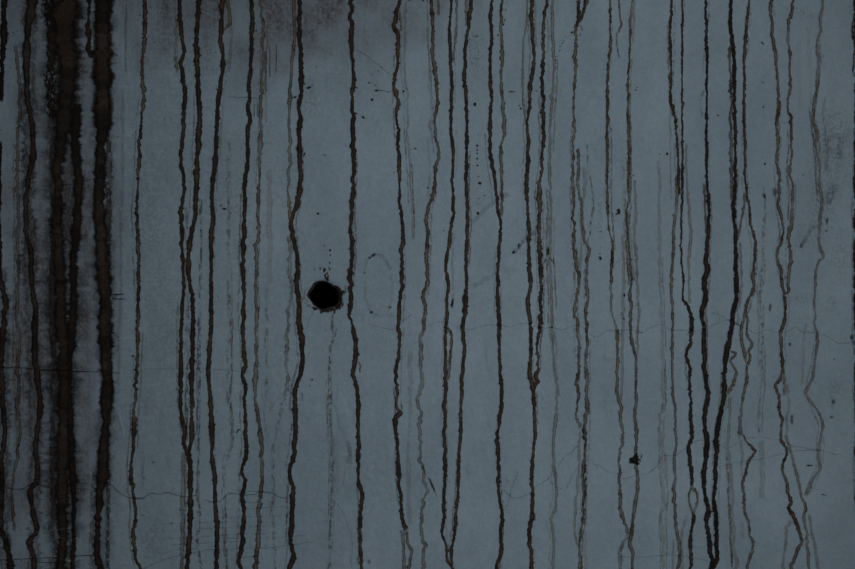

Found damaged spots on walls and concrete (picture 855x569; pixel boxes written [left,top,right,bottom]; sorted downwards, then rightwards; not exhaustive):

corrosion [174,0,274,569]
corrosion [284,0,305,569]
spalling [307,268,345,314]
corrosion [346,0,365,569]
corrosion [391,0,473,569]
corrosion [487,0,507,569]
corrosion [521,0,557,569]
corrosion [570,0,594,569]
corrosion [663,0,766,569]
corrosion [768,0,825,569]